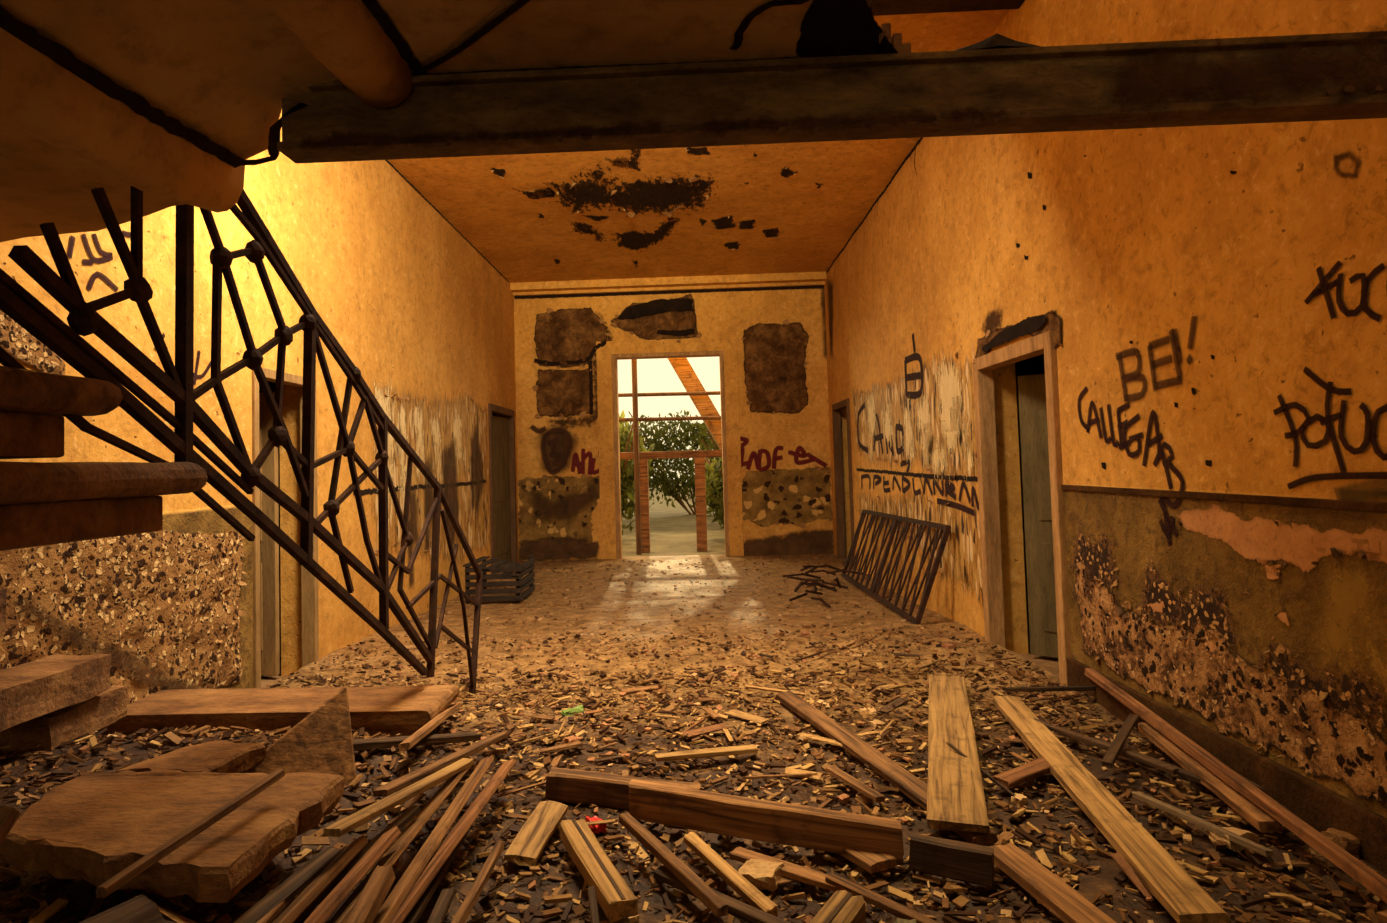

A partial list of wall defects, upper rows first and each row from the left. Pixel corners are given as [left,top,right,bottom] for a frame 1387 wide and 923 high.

flaking render [782,0,898,72]
peeling [684,147,711,155]
peeling [490,149,779,267]
flaking render [532,294,702,428]
flaking render [741,319,809,414]
peeling [518,474,600,561]
peeling [1176,503,1387,581]
flaking render [0,529,248,704]
flaking render [1074,557,1387,809]